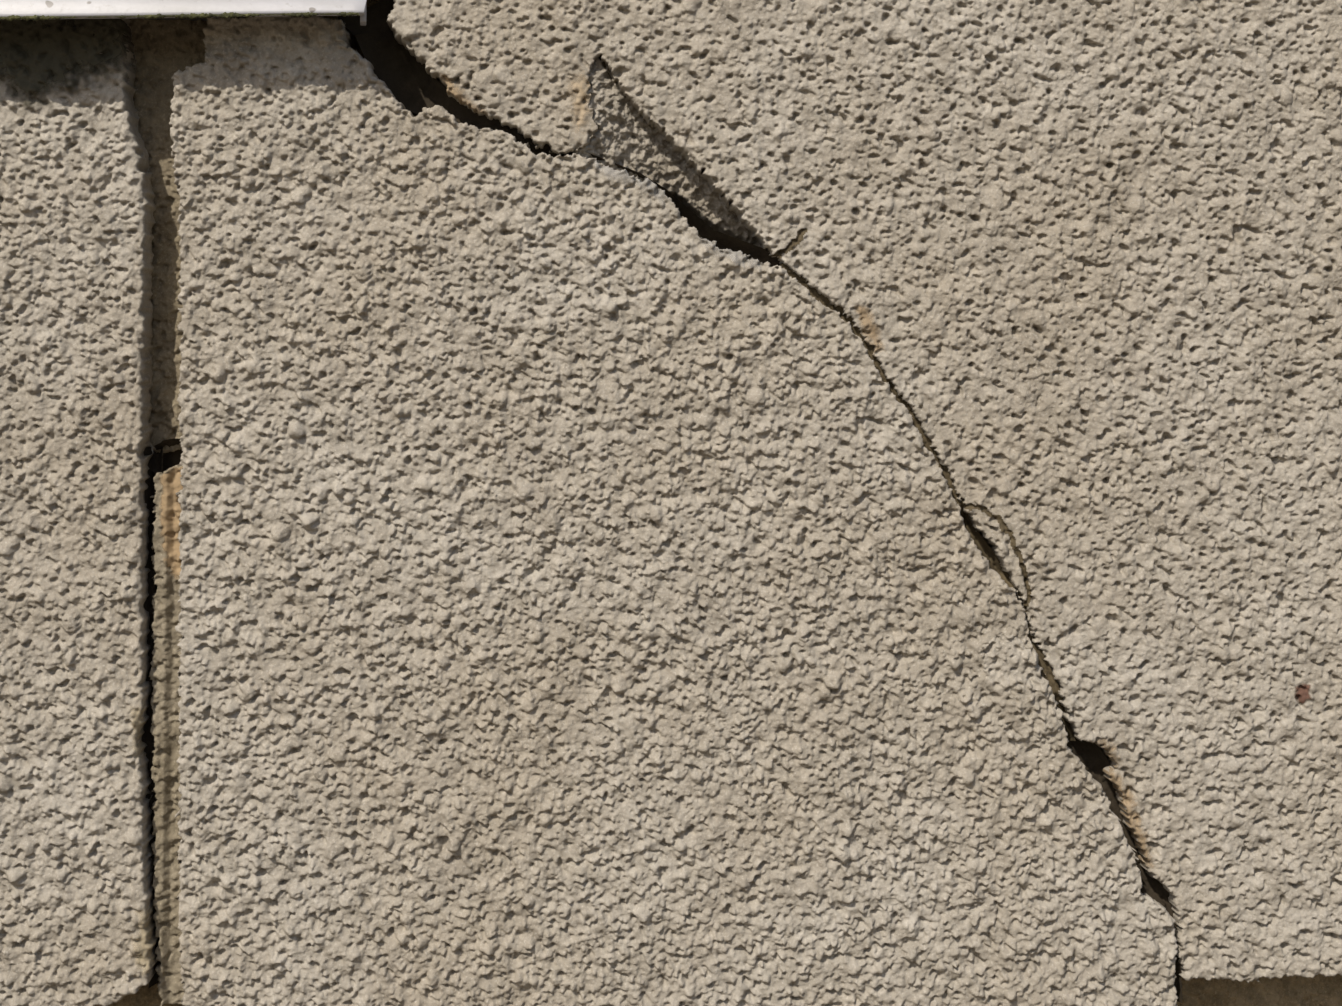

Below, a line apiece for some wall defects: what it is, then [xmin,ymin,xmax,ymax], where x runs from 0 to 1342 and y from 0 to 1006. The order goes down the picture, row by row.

crack [141,439,183,989]
crack [338,0,1183,1003]